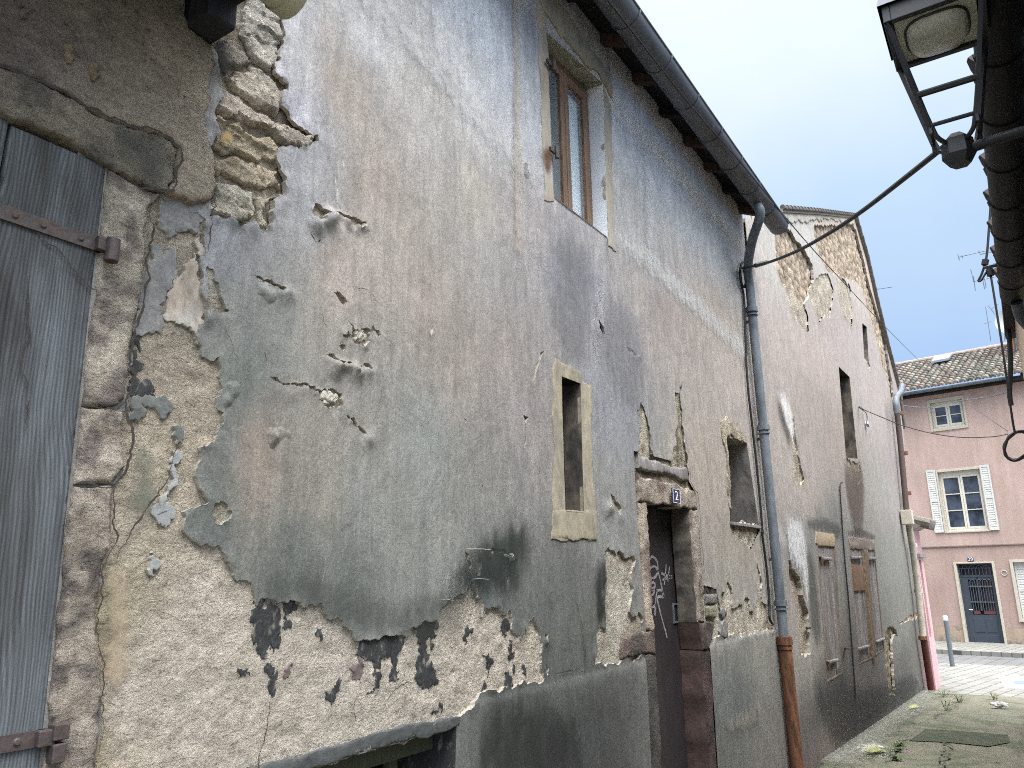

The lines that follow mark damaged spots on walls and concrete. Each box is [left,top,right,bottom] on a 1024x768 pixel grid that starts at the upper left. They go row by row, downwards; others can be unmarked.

flaking render [775,224,895,419]
crack [0,64,217,766]
flaking render [95,0,549,768]
flaking render [634,403,655,460]
flaking render [667,381,689,473]
water stain [458,525,528,592]
flaking render [595,547,644,666]
flaking render [703,563,774,643]
flaking render [788,560,811,658]
flaking render [885,612,918,696]